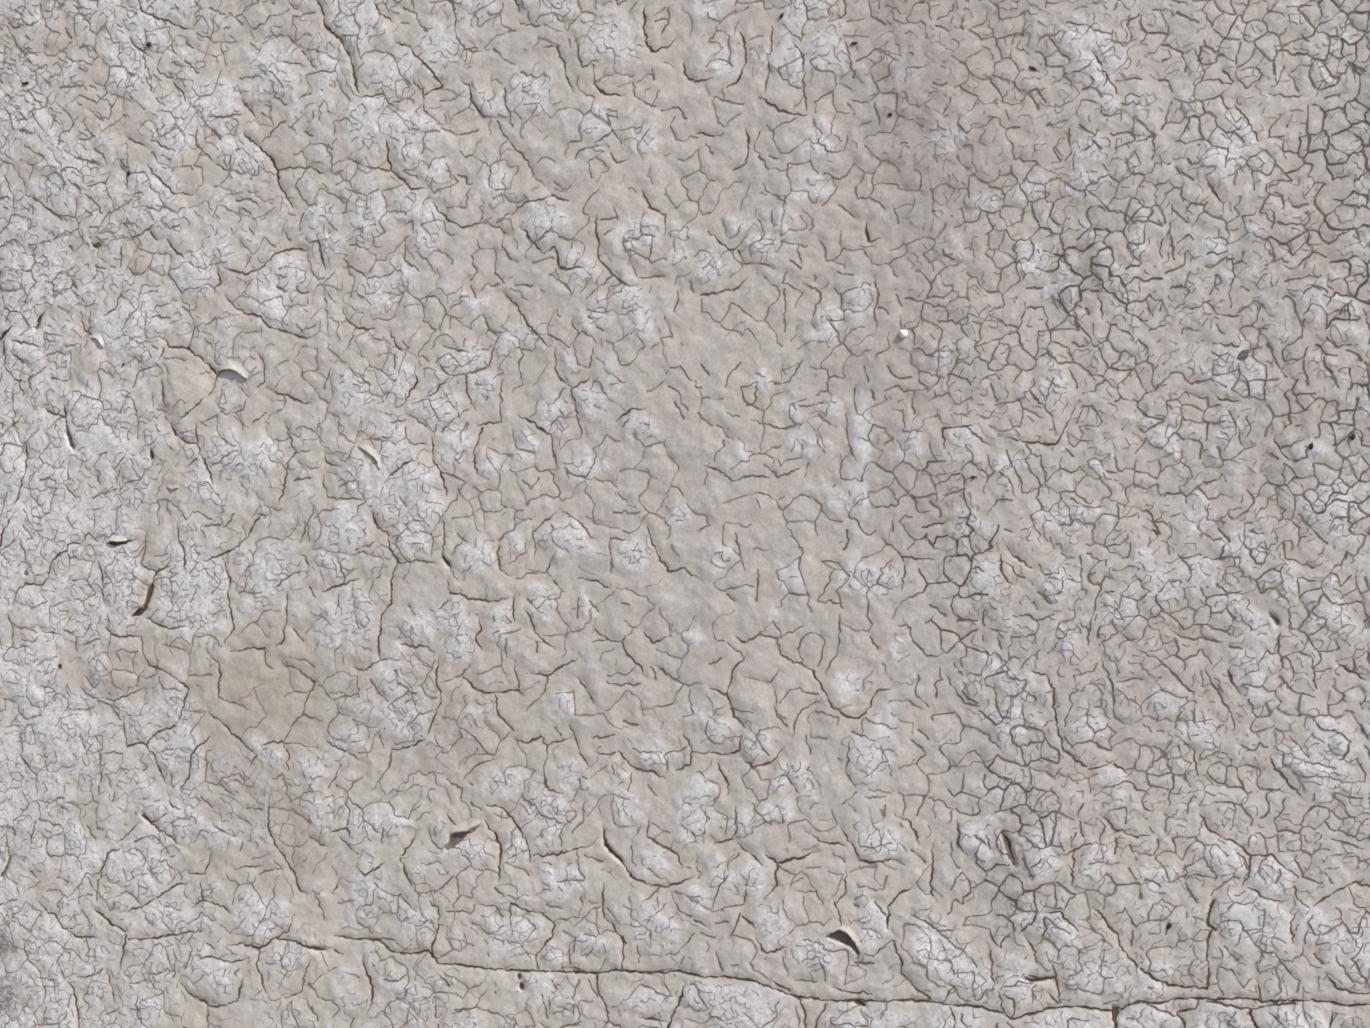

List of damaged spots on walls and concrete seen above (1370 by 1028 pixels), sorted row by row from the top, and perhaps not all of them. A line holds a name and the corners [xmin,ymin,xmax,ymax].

crack [533,36,654,182]
crack [515,0,696,121]
crack [622,148,751,283]
crack [674,271,803,349]
crack [646,381,689,419]
crack [230,647,279,679]
crack [430,582,521,683]
crack [526,580,701,730]
crack [710,521,760,602]
crack [723,491,850,612]
crack [817,520,933,674]
crack [882,663,930,709]